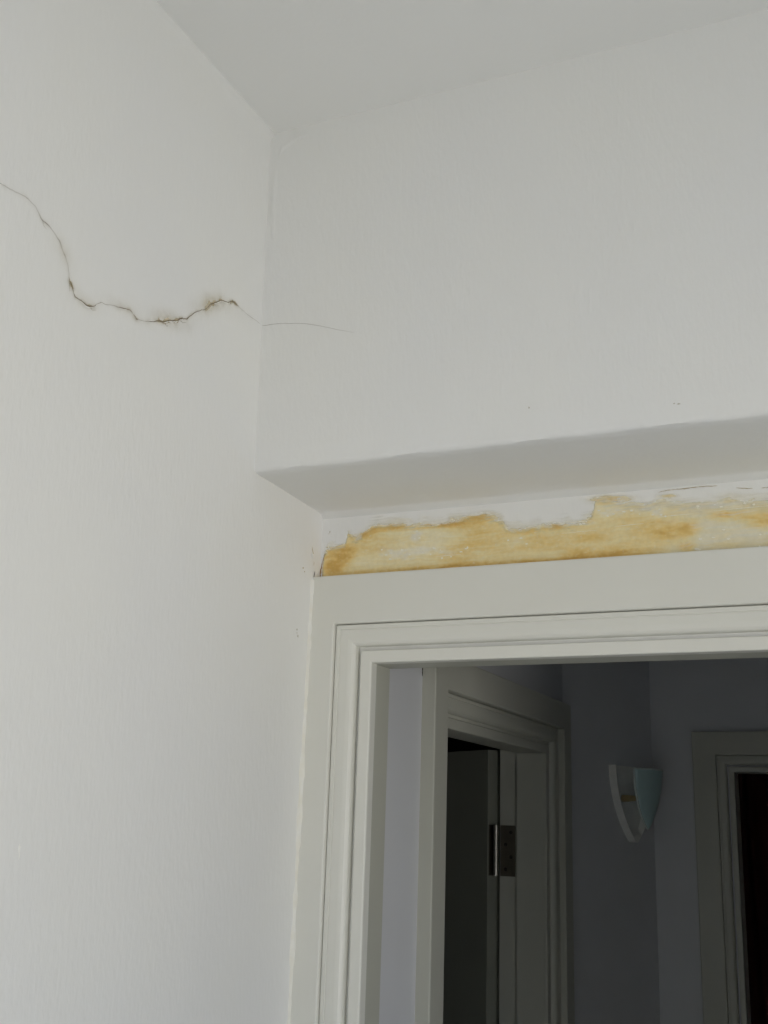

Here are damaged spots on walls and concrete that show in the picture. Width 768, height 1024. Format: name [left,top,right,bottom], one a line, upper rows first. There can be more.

crack [0,183,345,331]